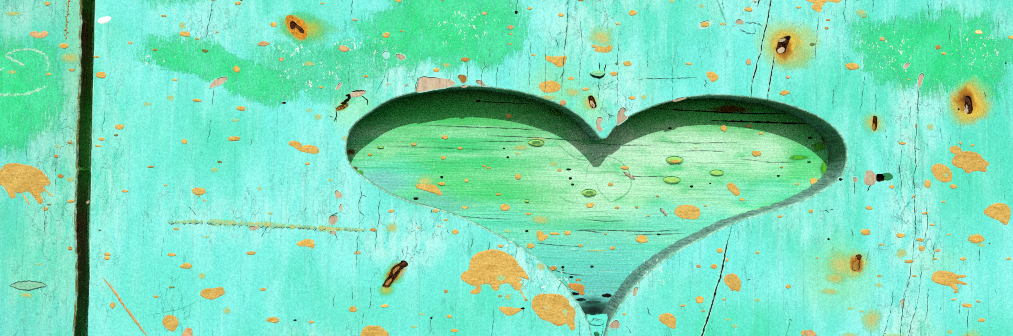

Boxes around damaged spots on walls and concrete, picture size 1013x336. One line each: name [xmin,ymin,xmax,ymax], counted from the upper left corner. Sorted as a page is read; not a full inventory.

corrosion [285,15,324,40]
corrosion [765,27,814,66]
corrosion [951,84,988,123]
corrosion [866,116,881,131]
corrosion [380,261,408,294]
crack [700,227,733,336]
corrosion [830,254,867,277]